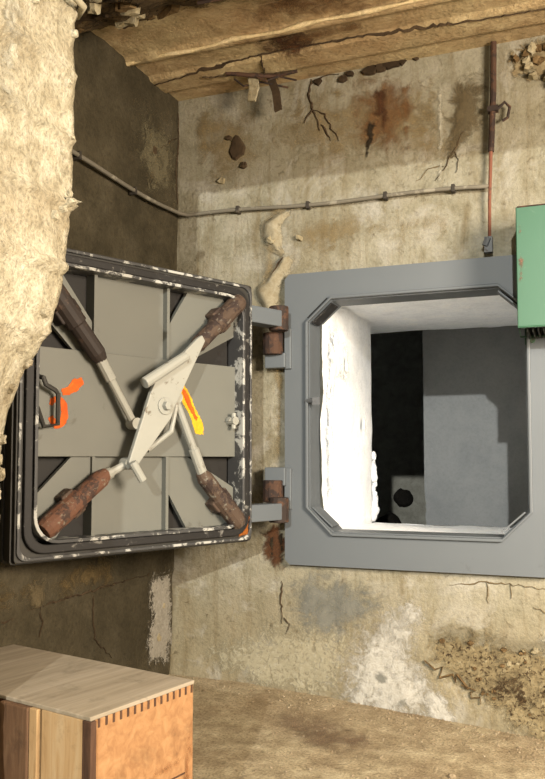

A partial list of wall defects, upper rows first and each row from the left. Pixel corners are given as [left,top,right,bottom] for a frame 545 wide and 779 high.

spalling [71,0,229,39]
crack [154,8,545,86]
spalling [508,37,545,81]
crack [304,74,339,141]
damp [297,82,486,158]
rust [262,525,285,569]
crack [279,581,290,634]
crack [455,581,545,613]
damp [209,574,456,722]
spalling [424,629,545,740]